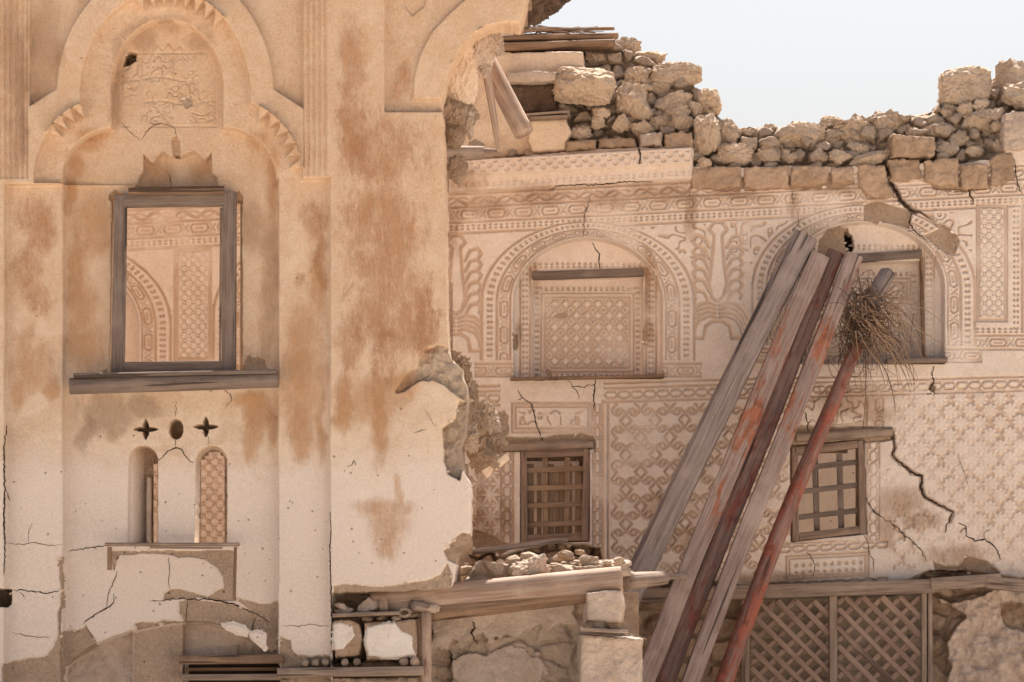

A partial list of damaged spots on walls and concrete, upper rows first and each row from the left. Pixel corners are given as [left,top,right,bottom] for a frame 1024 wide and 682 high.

crack [550,146,648,268]
crack [887,168,989,240]
spalling [396,345,596,480]
crack [518,379,596,440]
crack [3,425,105,597]
crack [891,436,1001,560]
crack [150,514,334,653]
peeling [112,550,416,682]
flaking render [639,602,664,658]
flaking render [676,601,710,682]
flaking render [701,600,741,682]
flaking render [906,556,1024,682]